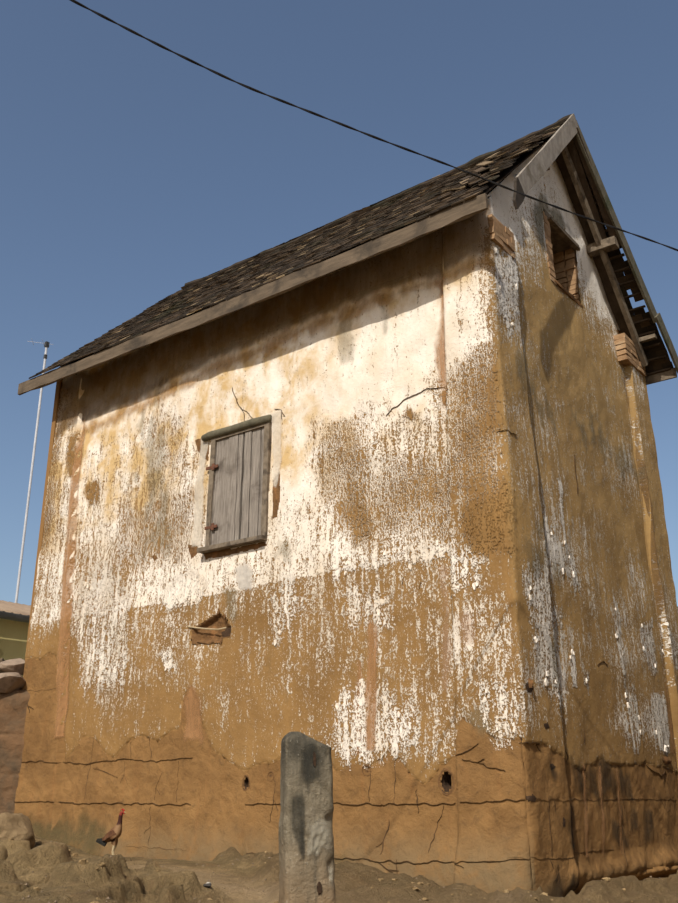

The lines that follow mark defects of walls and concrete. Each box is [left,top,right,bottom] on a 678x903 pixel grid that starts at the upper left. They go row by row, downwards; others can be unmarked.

peeling [486,242,520,338]
crack [387,387,445,415]
flaking render [272,473,280,519]
peeling [304,341,518,633]
peeling [70,479,267,697]
peeling [268,573,314,646]
peeling [475,478,591,750]
peeling [321,677,421,777]
peeling [613,596,671,765]
crack [14,736,193,851]
crack [248,780,280,823]
crack [334,758,675,884]